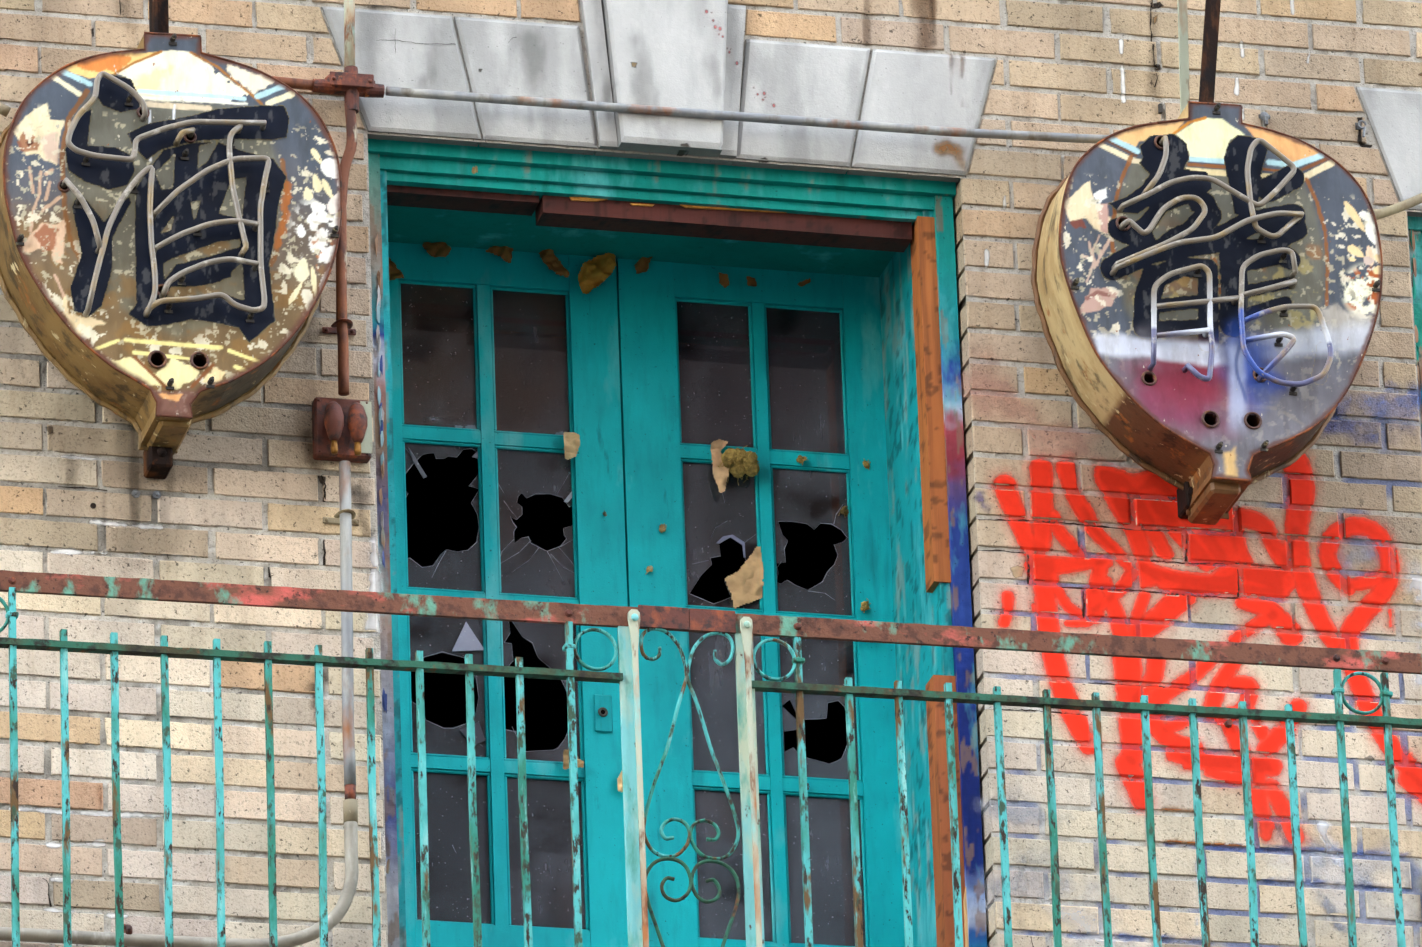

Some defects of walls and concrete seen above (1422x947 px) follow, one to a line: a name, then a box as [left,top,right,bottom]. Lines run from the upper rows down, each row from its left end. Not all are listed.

rust [935,141,962,160]